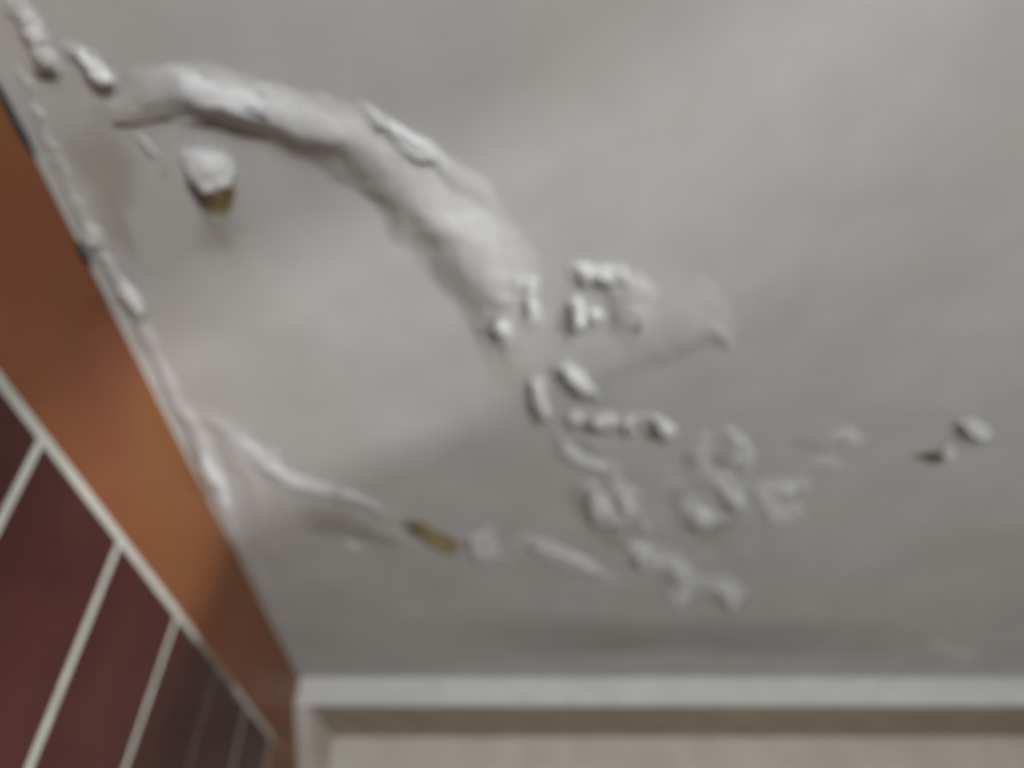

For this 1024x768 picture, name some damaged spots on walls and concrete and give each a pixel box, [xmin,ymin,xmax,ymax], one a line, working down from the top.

peeling [0,0,188,127]
peeling [178,144,236,214]
peeling [487,275,543,361]
peeling [561,258,659,345]
peeling [526,354,680,440]
peeling [662,422,813,535]
peeling [915,446,956,462]
peeling [960,419,994,441]
peeling [581,472,749,615]